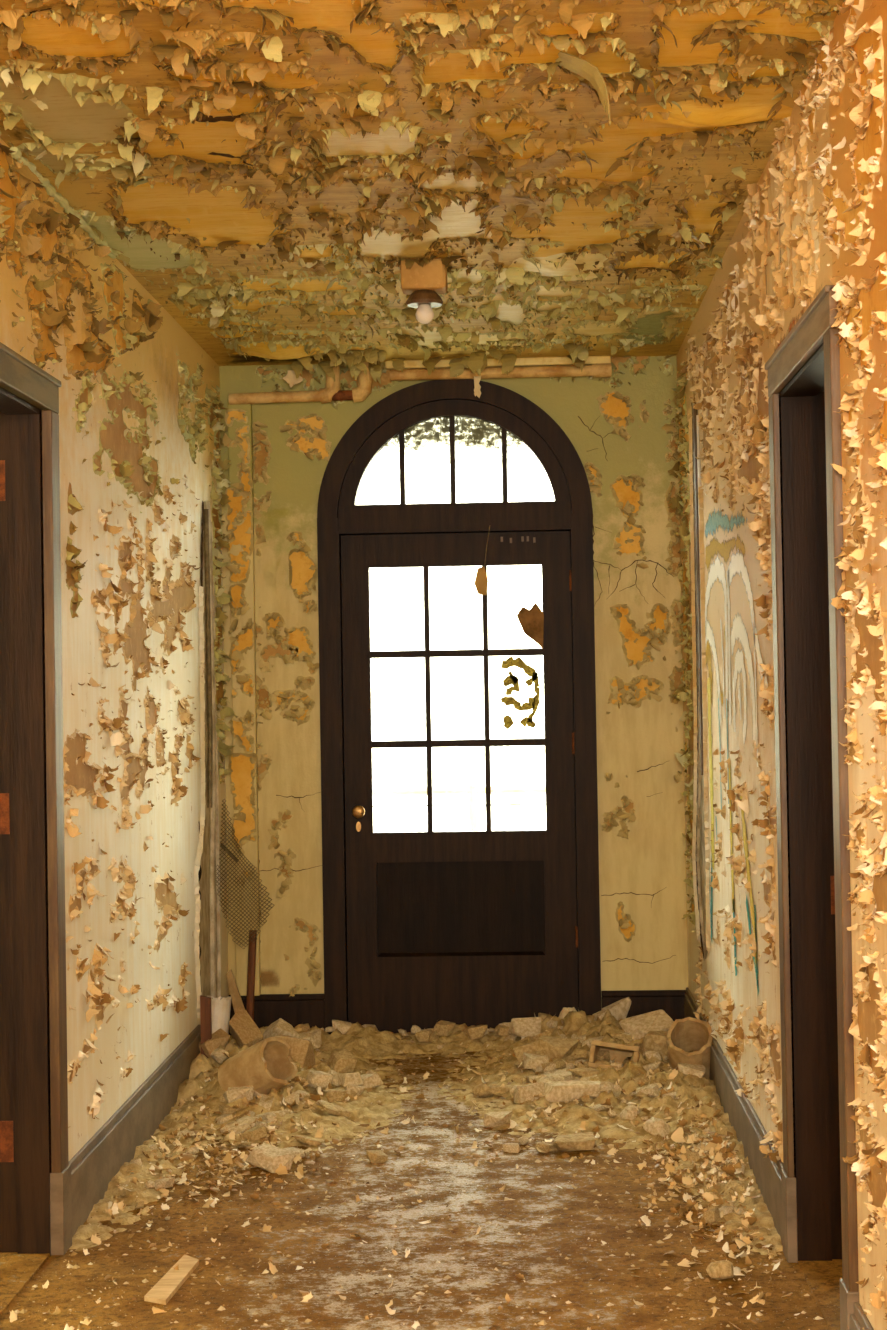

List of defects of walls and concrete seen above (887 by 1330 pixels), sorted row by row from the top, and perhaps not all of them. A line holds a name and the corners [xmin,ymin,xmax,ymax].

peeling [65,482,86,618]
peeling [286,531,318,616]
peeling [584,462,649,569]
peeling [501,656,540,729]
crack [592,401,704,964]
peeling [63,729,119,838]
peeling [712,749,756,819]
peeling [830,252,887,1267]
peeling [68,839,140,944]
peeling [142,865,189,969]
peeling [65,929,147,1085]
spalling [199,1006,300,1058]